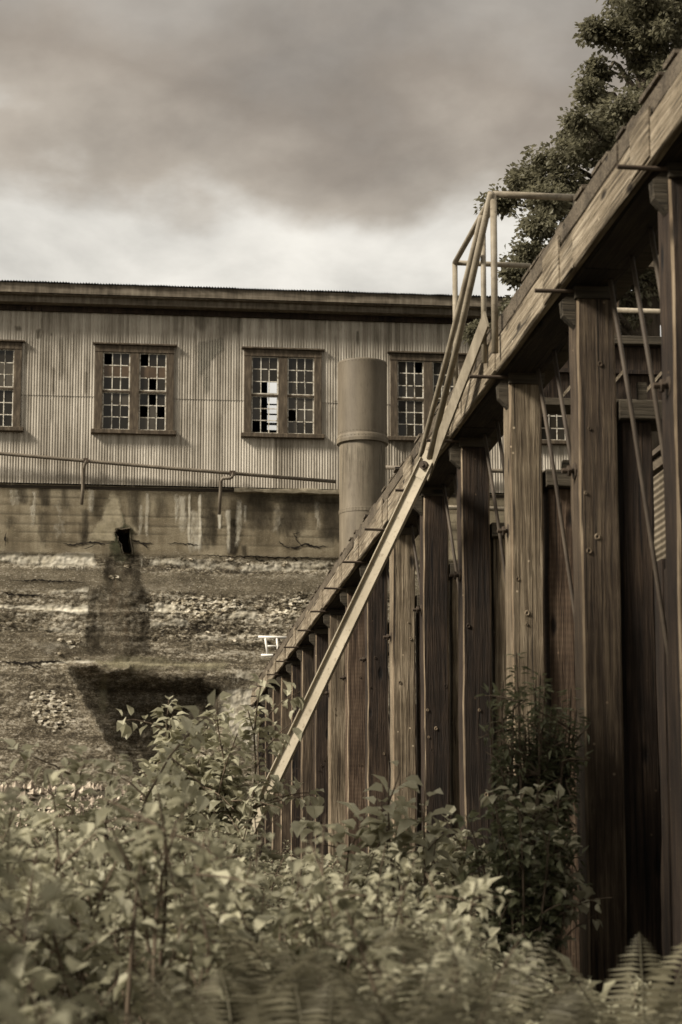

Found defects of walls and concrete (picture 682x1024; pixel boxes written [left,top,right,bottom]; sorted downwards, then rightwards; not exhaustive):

peeling [90,493,133,579]
damp [0,494,339,578]
crack [60,532,328,562]
damp [140,592,187,635]
damp [214,611,256,619]